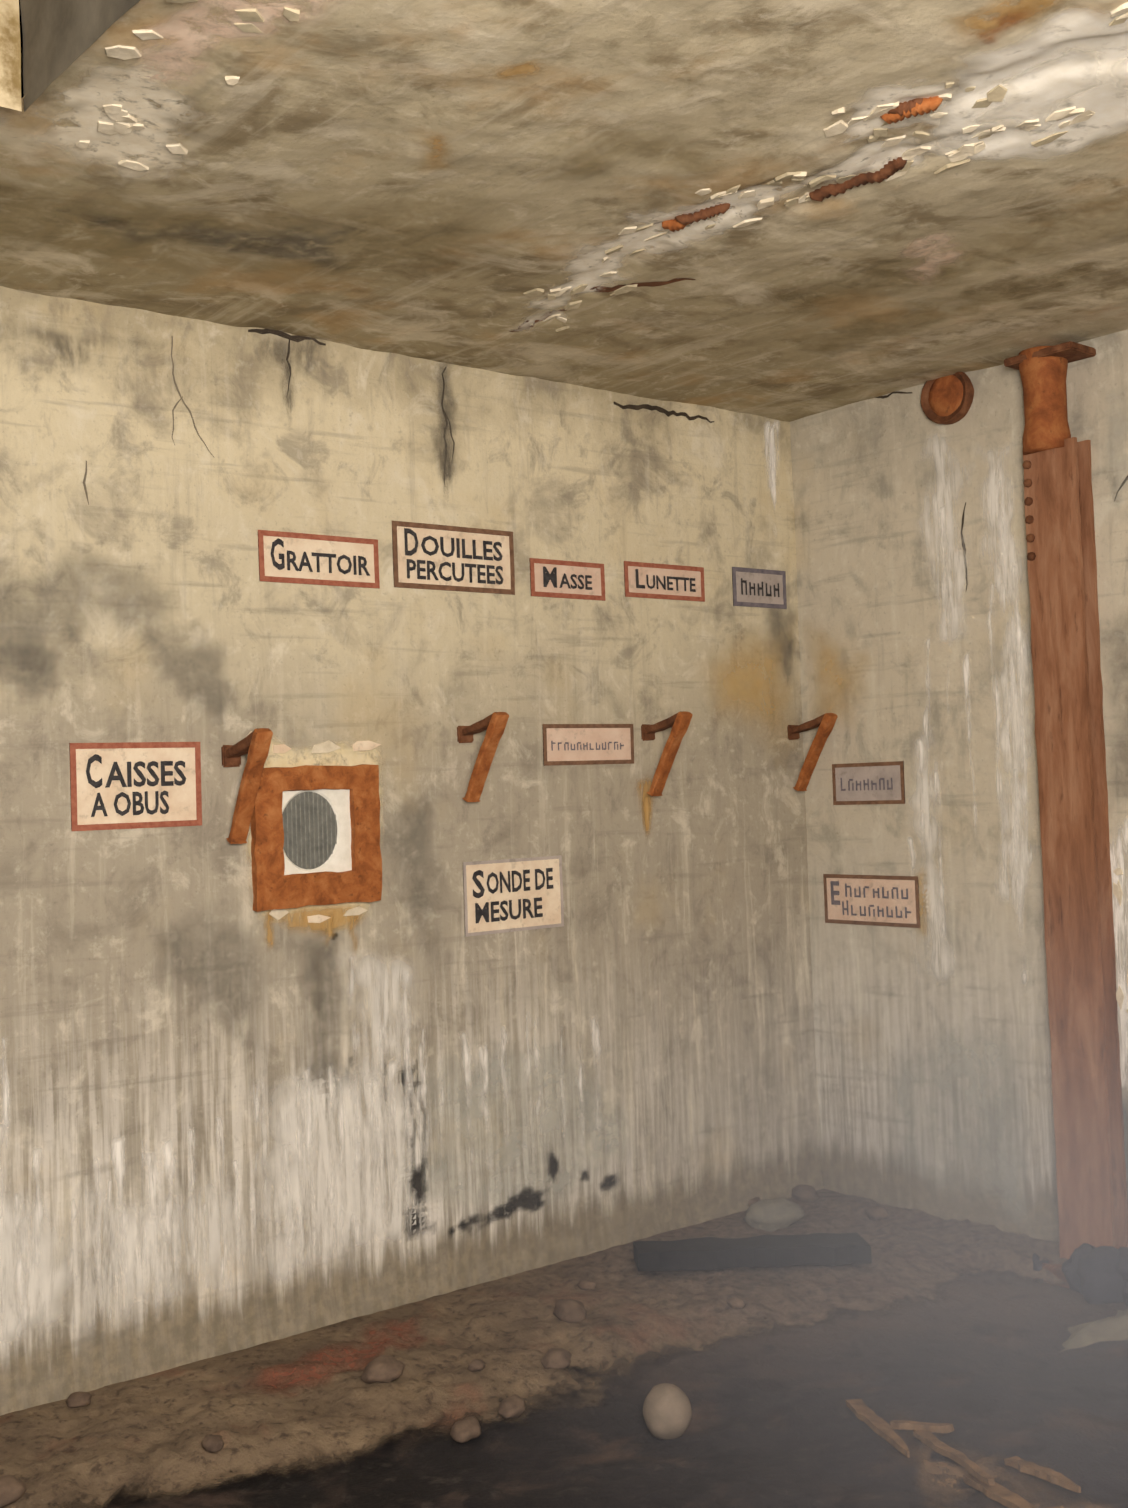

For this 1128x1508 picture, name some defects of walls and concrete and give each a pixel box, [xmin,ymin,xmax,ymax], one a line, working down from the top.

spalling [1109,2,1128,26]
spalling [522,82,1095,332]
crack [614,402,714,423]
leakage [924,439,965,648]
leakage [983,453,1032,919]
corrosion [267,908,358,945]
leakage [908,701,953,977]
leakage [0,1149,72,1339]
leakage [72,960,443,1321]
leakage [449,1188,543,1234]
leakage [549,1154,558,1179]
leakage [582,1171,616,1189]